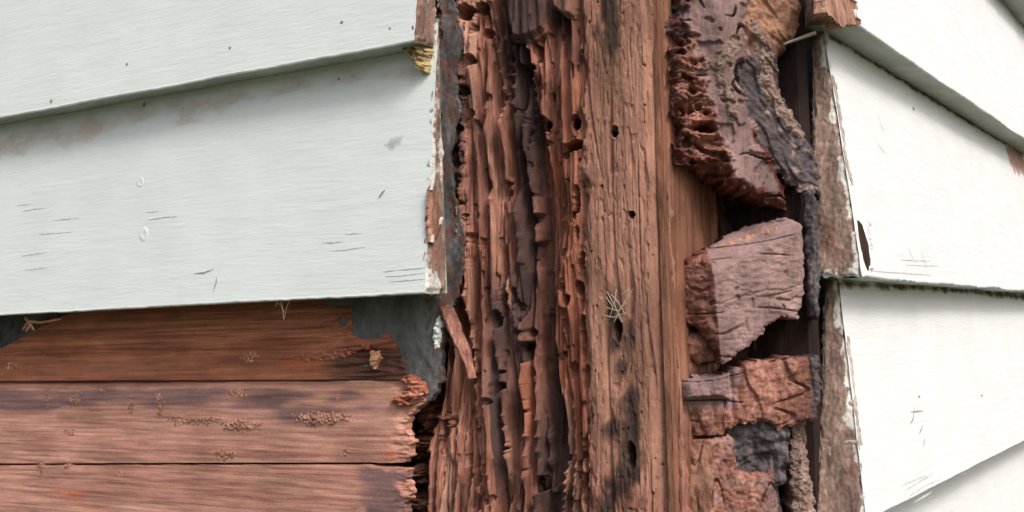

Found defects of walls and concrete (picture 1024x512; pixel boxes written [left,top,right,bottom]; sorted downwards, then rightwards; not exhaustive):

peeling [830,75,853,185]
peeling [426,180,443,245]